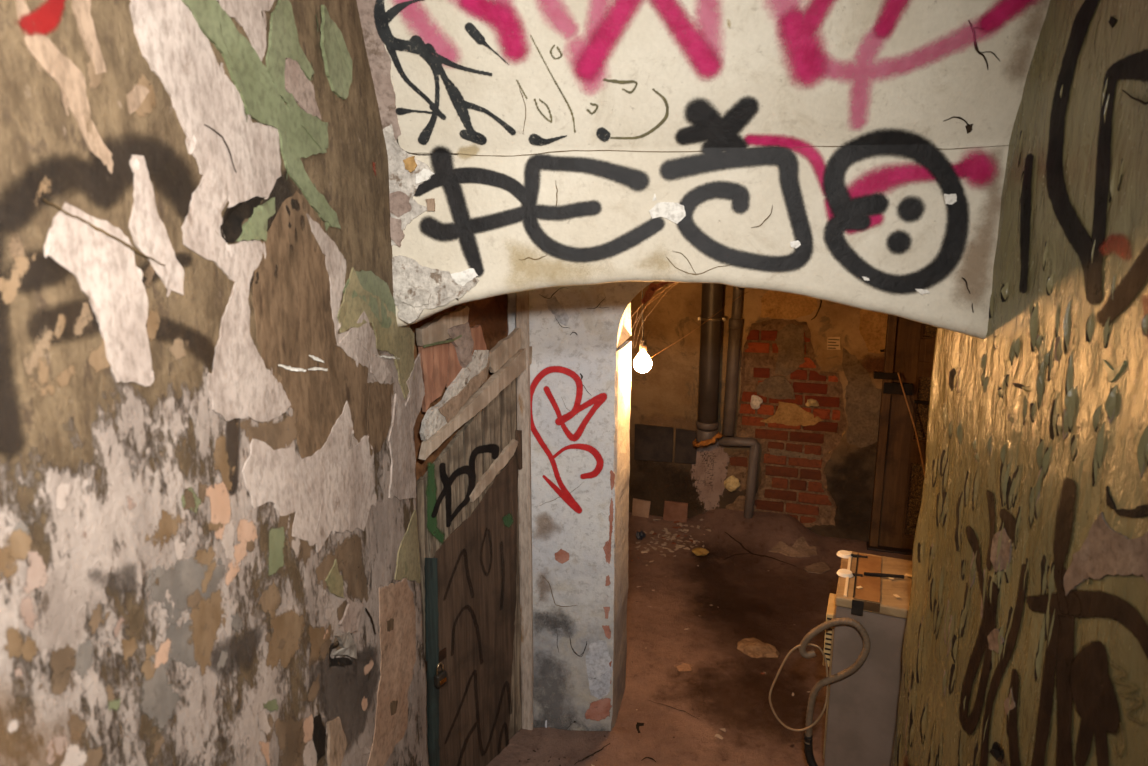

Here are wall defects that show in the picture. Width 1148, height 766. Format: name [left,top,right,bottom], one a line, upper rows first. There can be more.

peeling [0,0,479,766]
flaking render [726,319,847,527]
peeling [897,237,1148,766]
water stain [535,613,571,633]
water stain [533,656,574,730]